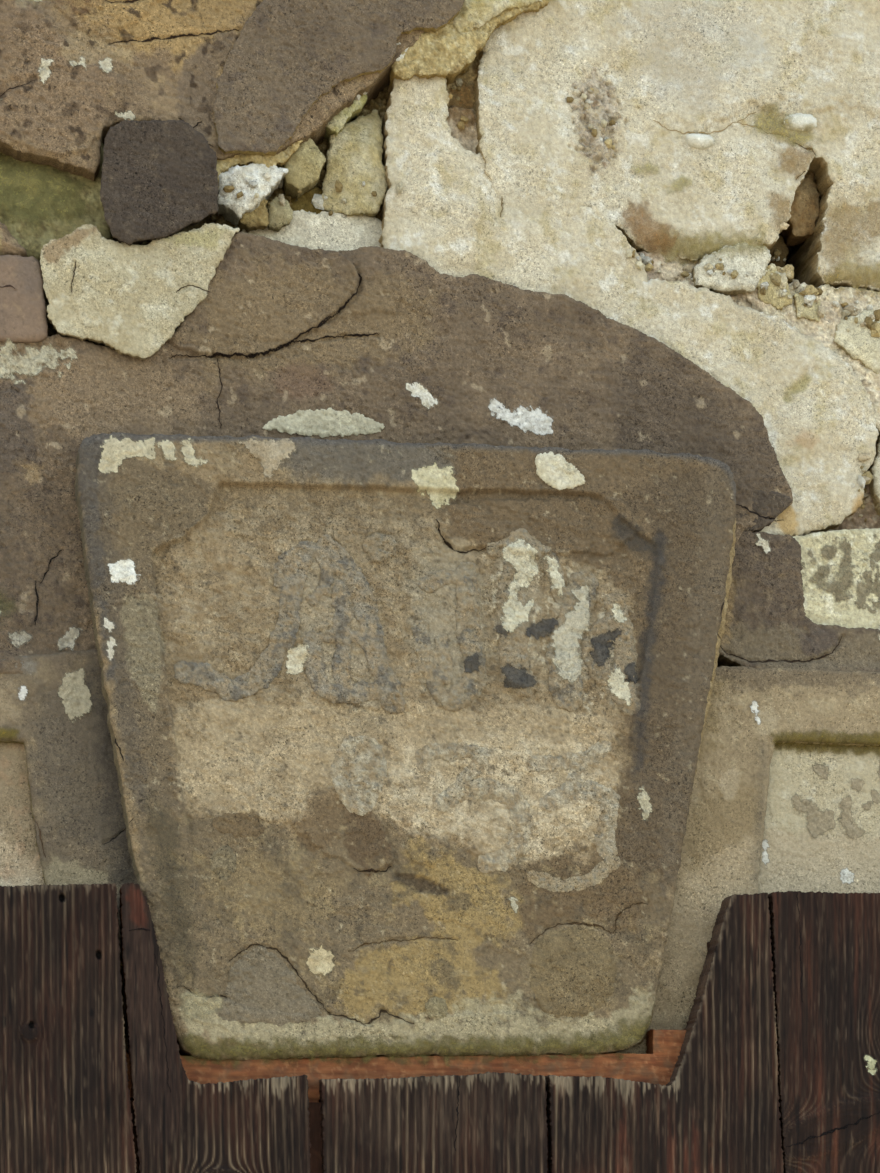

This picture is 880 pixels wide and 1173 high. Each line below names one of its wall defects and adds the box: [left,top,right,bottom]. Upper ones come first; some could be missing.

crack [170,263,379,428]
crack [229,943,414,1024]
crack [348,937,456,952]